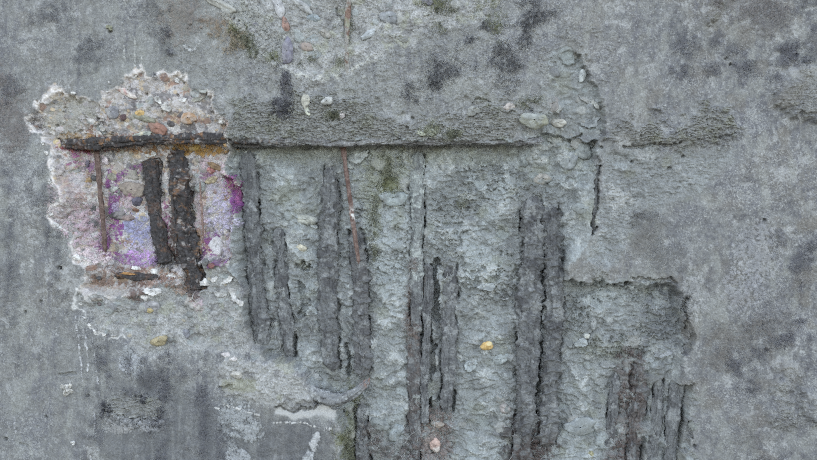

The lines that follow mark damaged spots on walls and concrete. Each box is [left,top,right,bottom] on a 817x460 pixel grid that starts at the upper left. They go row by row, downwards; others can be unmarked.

spalling [205,0,501,83]
rust [95,144,295,357]
rust [316,166,374,379]
spalling [24,48,743,460]
rust [500,196,567,460]
crack [568,134,682,236]
rust [602,363,686,460]